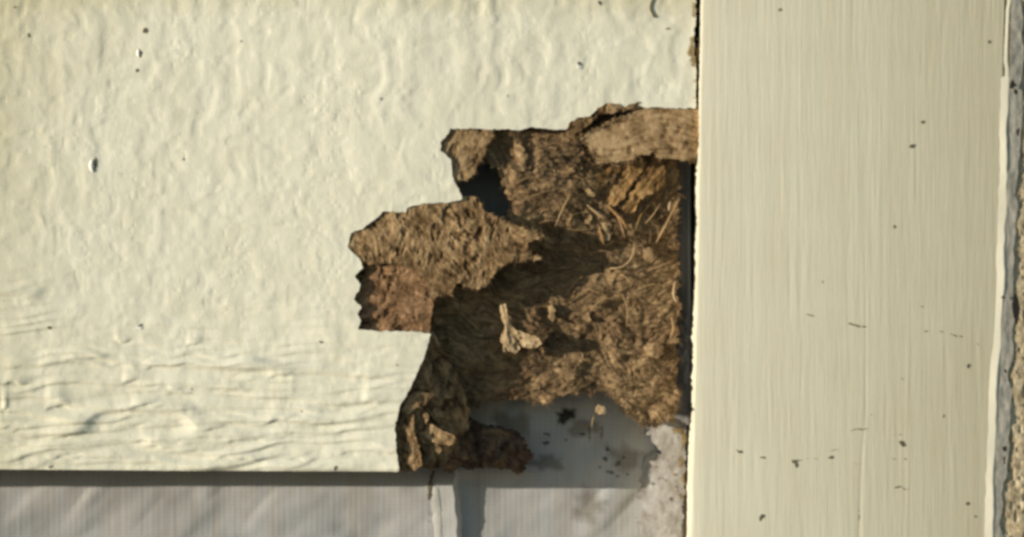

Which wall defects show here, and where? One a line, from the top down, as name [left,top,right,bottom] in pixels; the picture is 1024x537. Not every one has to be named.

peeling [567,102,640,134]
peeling [513,143,531,171]
peeling [593,160,665,213]
peeling [597,219,623,272]
peeling [643,247,657,261]
peeling [644,342,664,359]
peeling [401,353,458,471]